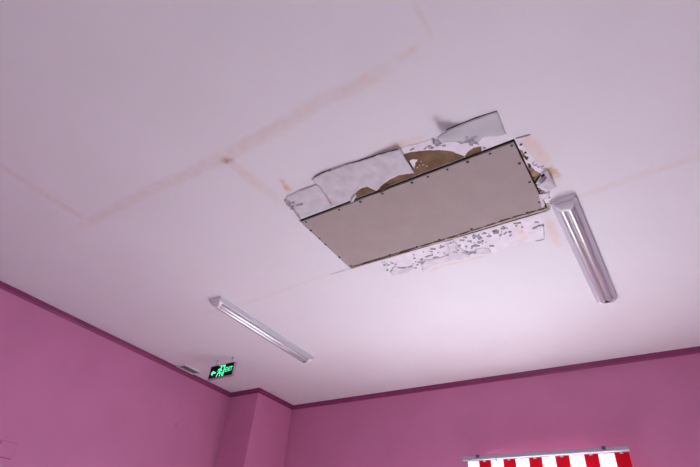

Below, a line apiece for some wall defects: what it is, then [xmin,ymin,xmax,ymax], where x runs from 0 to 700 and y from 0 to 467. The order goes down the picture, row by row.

peeling [284,111,556,276]